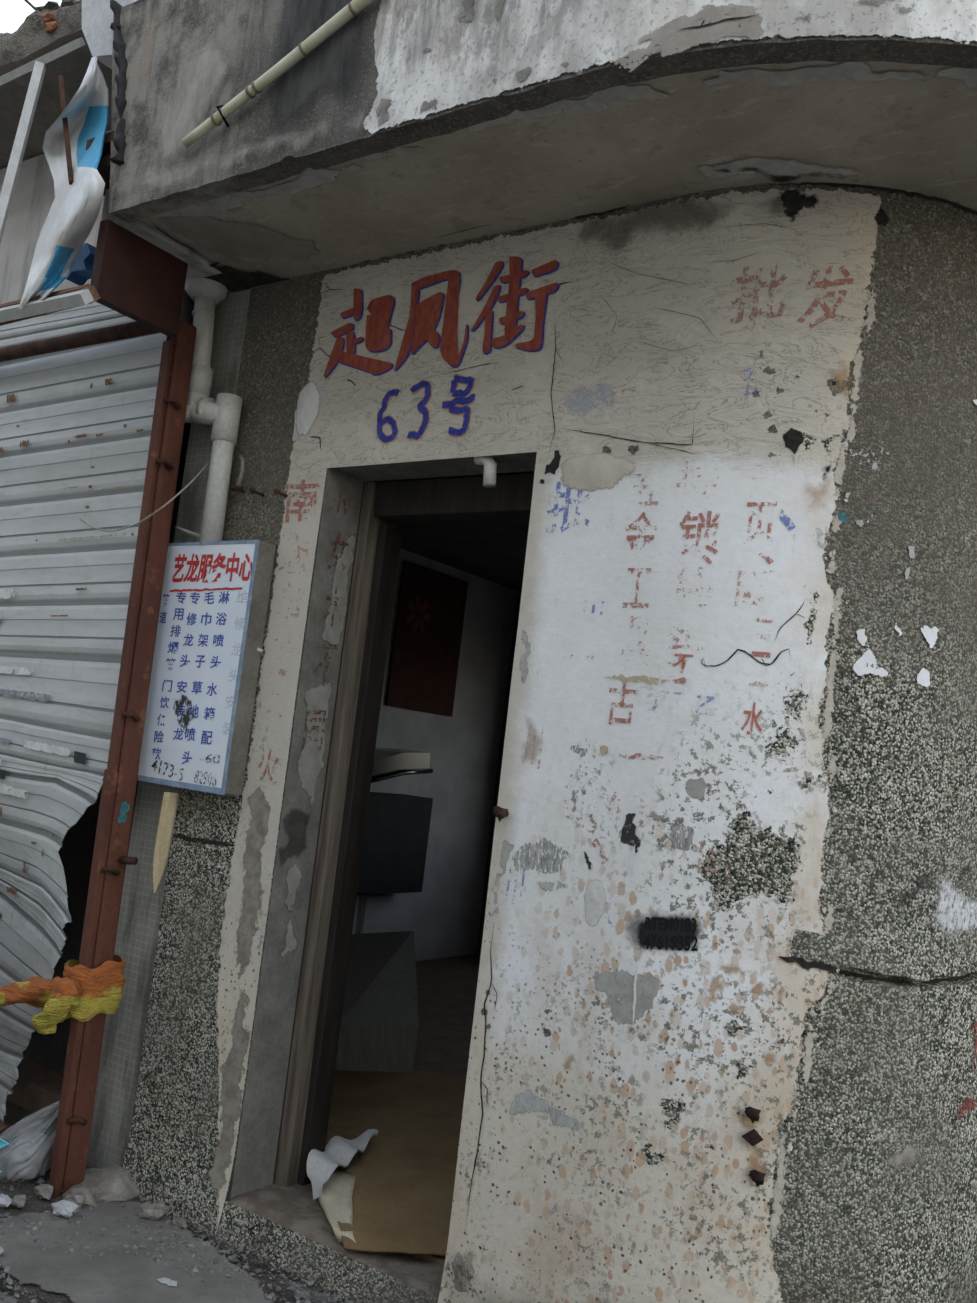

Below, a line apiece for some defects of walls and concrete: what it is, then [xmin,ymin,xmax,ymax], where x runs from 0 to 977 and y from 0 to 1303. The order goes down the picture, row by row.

peeling [466,0,763,131]
peeling [858,0,915,13]
peeling [146,152,390,220]
peeling [669,790,806,957]
crack [466,926,497,1224]